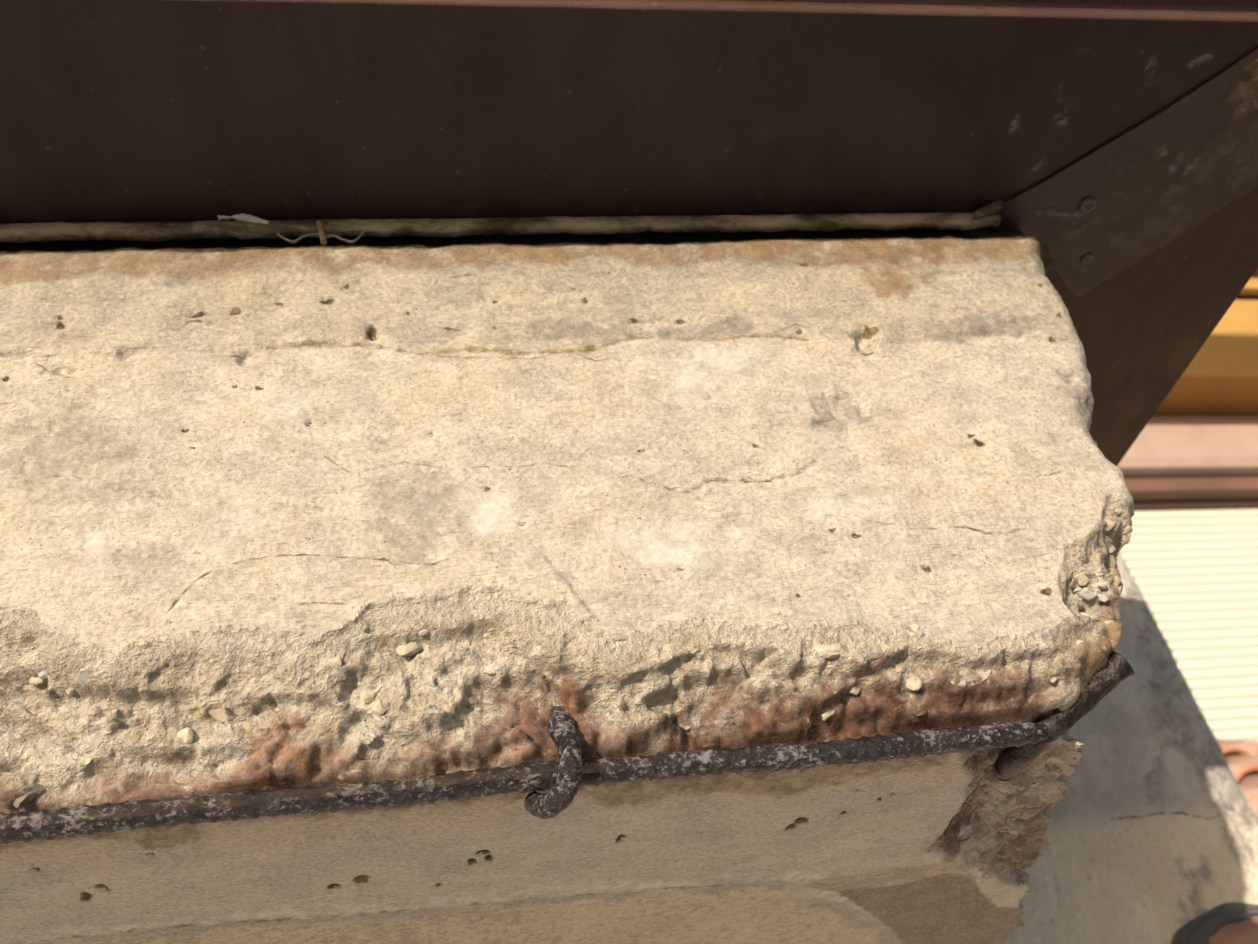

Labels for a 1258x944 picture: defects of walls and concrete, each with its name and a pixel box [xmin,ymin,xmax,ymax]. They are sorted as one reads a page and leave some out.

crack [681,323,809,341]
crack [232,337,644,361]
spalling [0,493,1135,813]
rust [661,657,1049,753]
rust [0,668,645,825]
spalling [932,730,1084,924]
spalling [468,850,492,865]
spalling [81,884,110,901]
spalling [327,876,368,889]